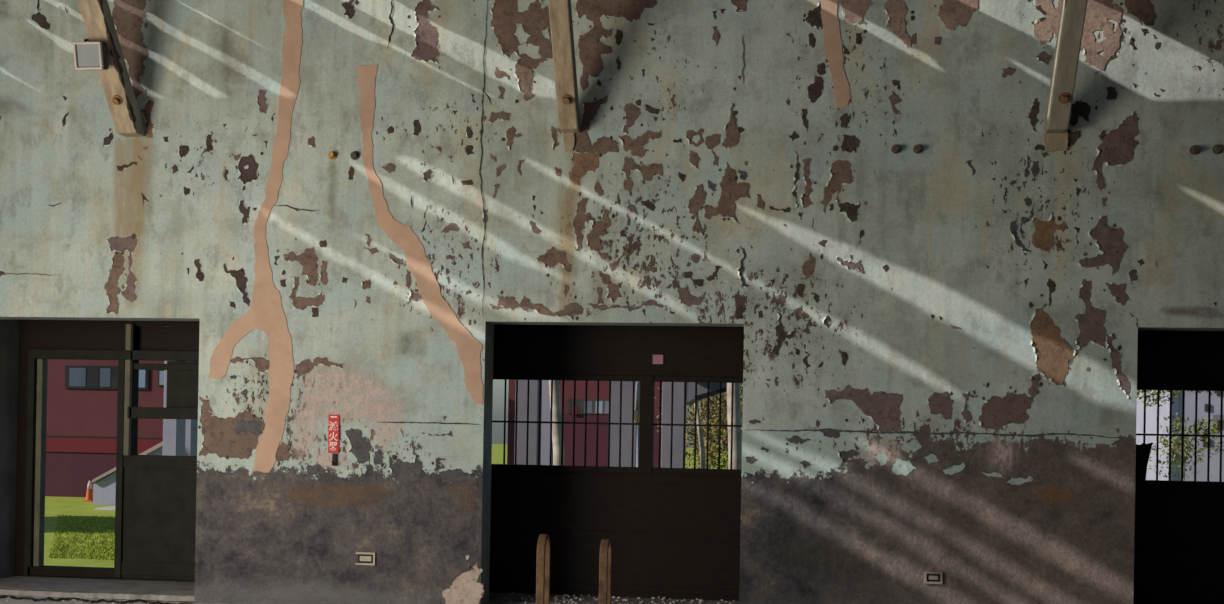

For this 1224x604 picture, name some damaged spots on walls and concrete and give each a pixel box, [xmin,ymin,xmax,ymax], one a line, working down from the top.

peeling [408,0,441,69]
peeling [839,0,917,54]
peeling [1080,0,1160,71]
peeling [465,0,553,223]
peeling [1068,86,1118,155]
peeling [489,0,867,321]
peeling [104,234,139,314]
peeling [925,98,1158,485]
peeling [735,306,823,369]
peeling [198,396,265,460]
peeling [786,383,939,476]
spalling [440,555,485,604]